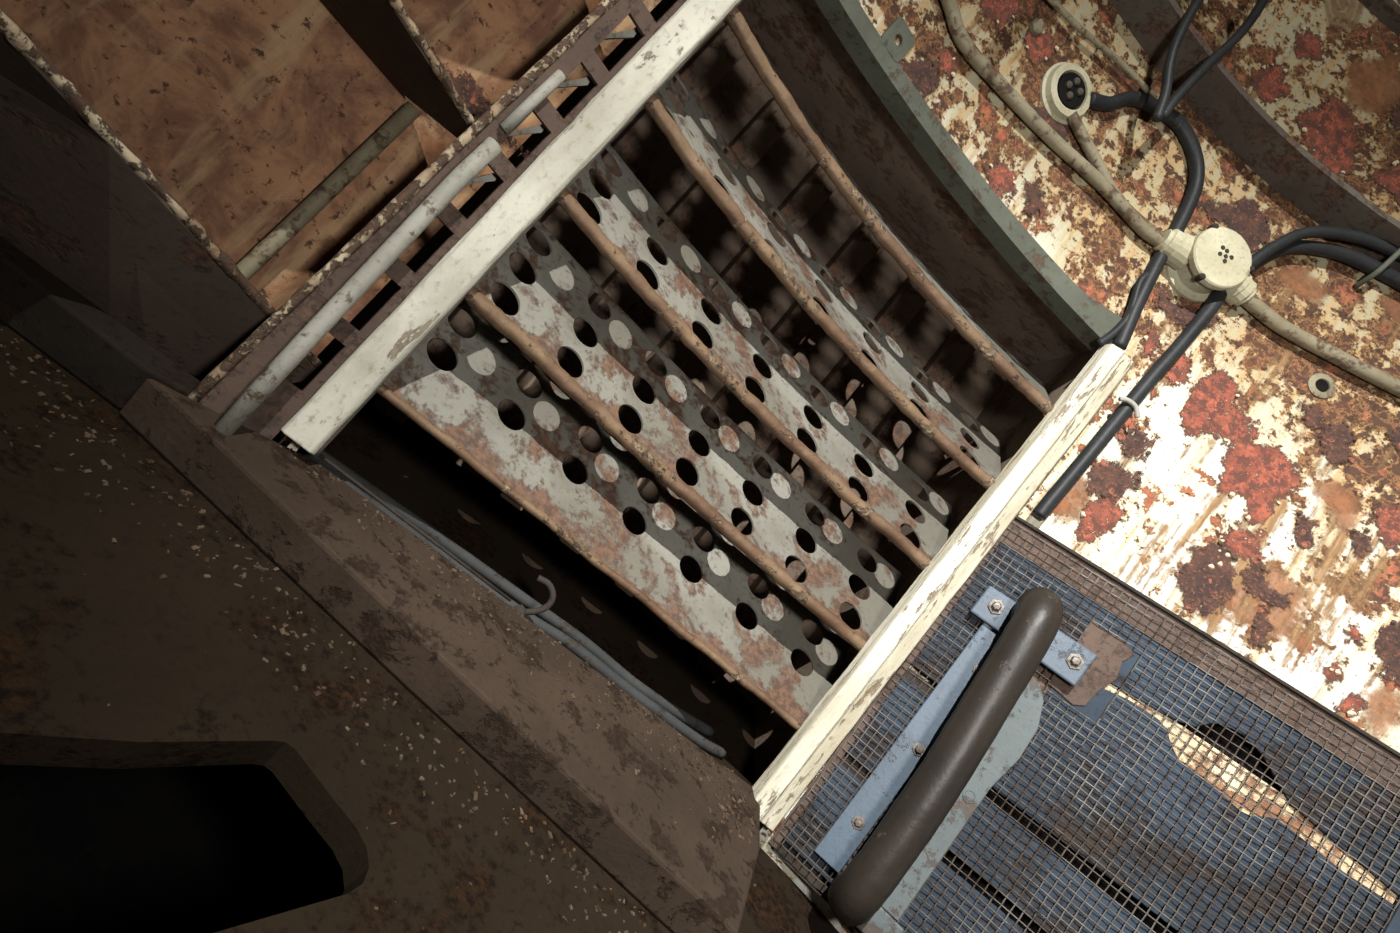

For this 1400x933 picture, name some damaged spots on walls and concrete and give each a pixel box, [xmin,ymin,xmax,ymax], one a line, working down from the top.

rust [899,47,944,109]
rust [1022,103,1074,216]
rust [1197,195,1279,253]
rust [1152,289,1223,333]
rust [1053,419,1158,524]
peeling [1135,329,1305,569]
rust [1385,424,1400,460]
peeling [1074,496,1129,551]
rust [1119,399,1389,671]
peeling [1369,502,1400,552]
peeling [1314,621,1370,717]
rust [1358,617,1400,739]